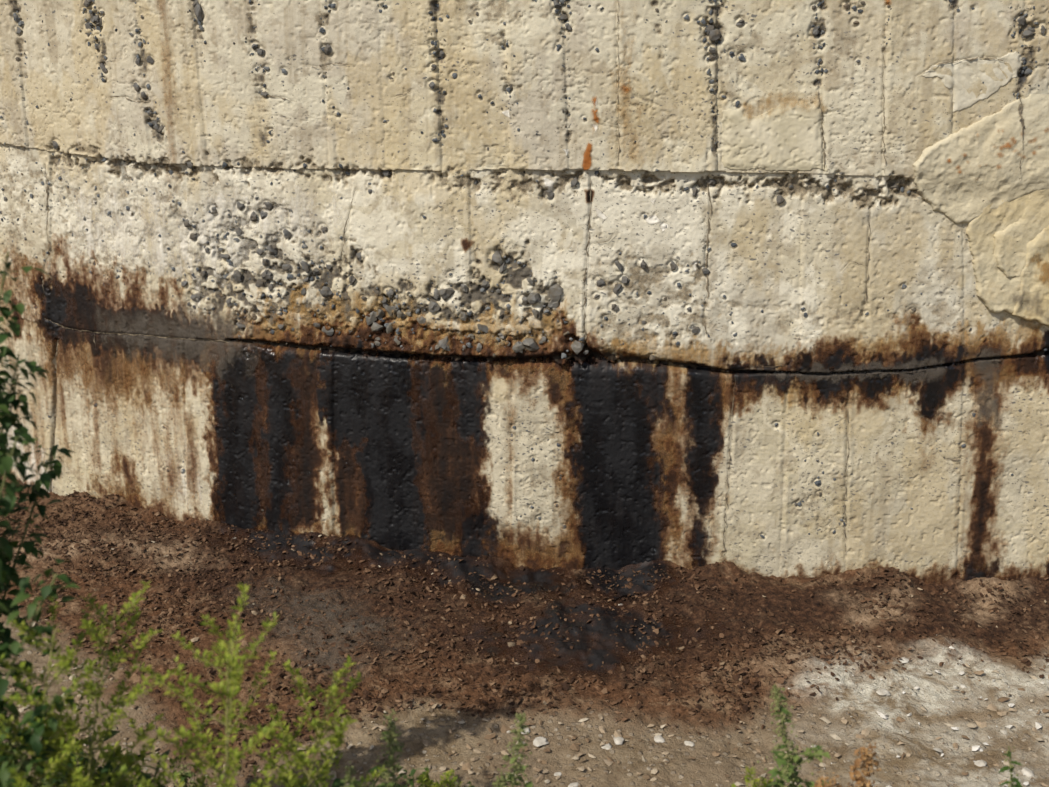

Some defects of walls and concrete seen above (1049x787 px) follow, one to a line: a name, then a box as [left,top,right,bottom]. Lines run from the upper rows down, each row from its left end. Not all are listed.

spalling [79,0,167,142]
spalling [233,0,287,146]
spalling [421,1,460,146]
rust [582,143,592,170]
spalling [0,135,589,359]
crack [41,169,821,559]
rust [233,283,781,445]
water stain [25,184,1049,576]
crack [893,349,1048,372]
water stain [4,419,56,493]
rust [488,465,579,568]
water stain [996,562,1049,581]